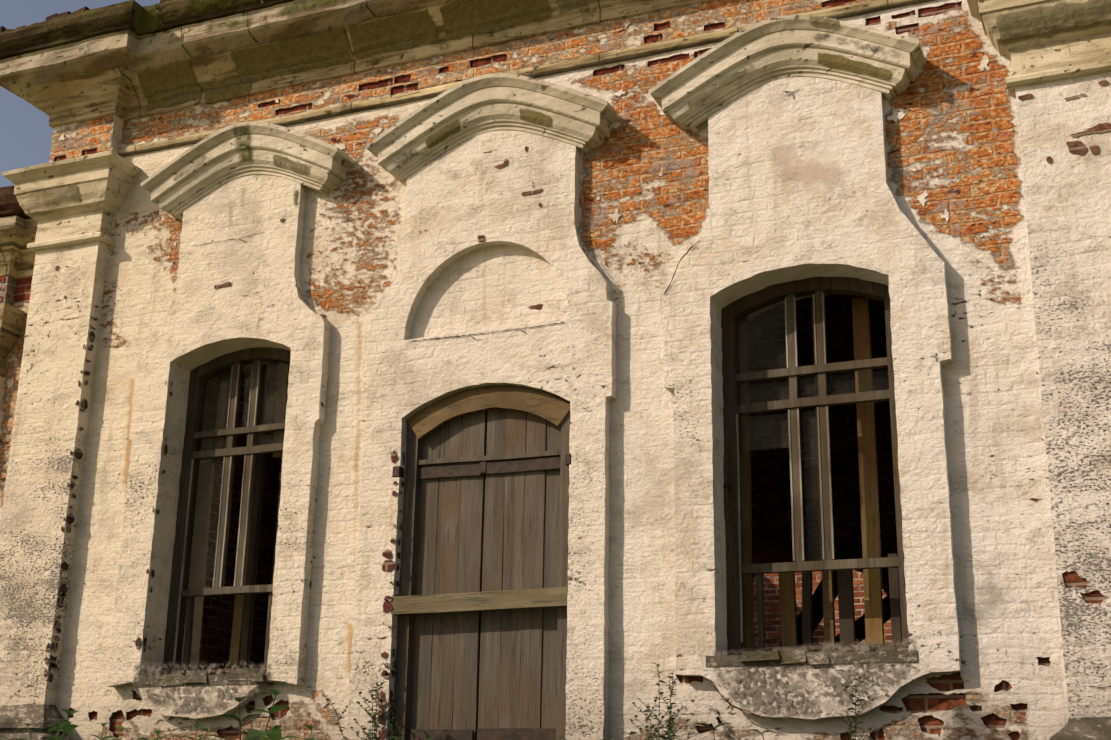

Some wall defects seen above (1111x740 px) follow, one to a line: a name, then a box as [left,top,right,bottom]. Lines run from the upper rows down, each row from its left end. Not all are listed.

peeling [304,115,402,317]
damp [19,0,713,129]
peeling [49,0,870,162]
peeling [568,49,709,300]
peeling [818,53,891,80]
peeling [864,0,1111,304]
peeling [0,276,33,506]
peeling [75,210,182,412]
spalling [44,562,69,682]
spalling [1062,571,1106,604]
peeling [91,677,340,740]
peeling [802,672,1030,740]